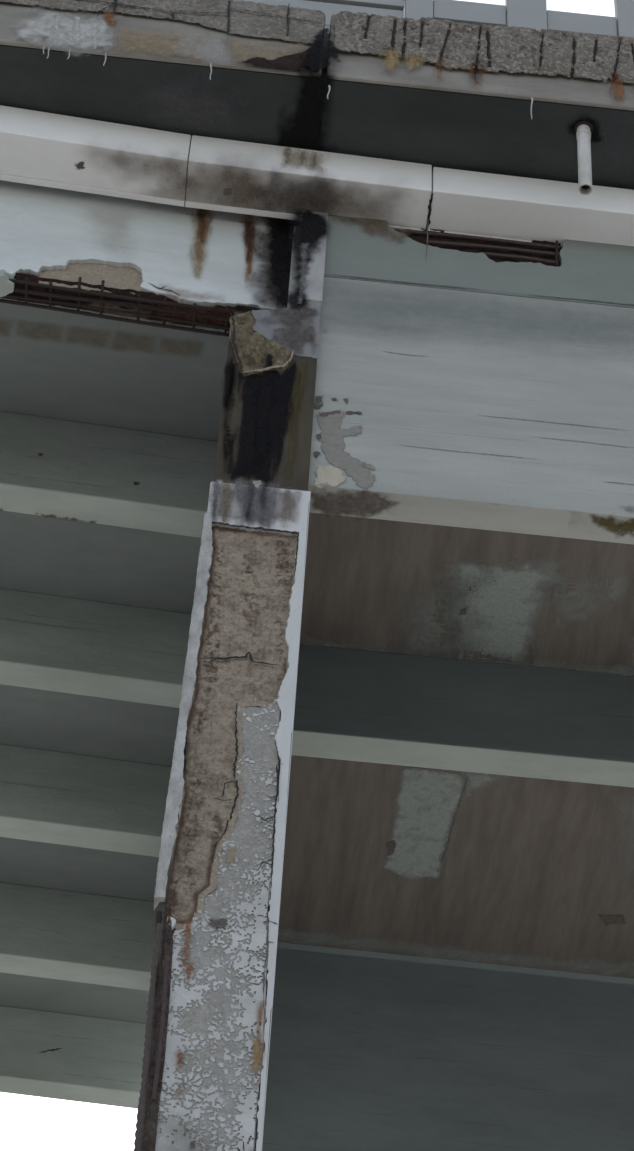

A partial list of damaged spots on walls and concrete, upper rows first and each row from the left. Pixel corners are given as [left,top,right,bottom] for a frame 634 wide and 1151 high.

damp [18,13,205,59]
corrosion [193,209,210,276]
corrosion [242,214,255,280]
damp [176,28,396,528]
spalling [394,225,561,267]
spalling [0,263,295,376]
peeling [314,395,375,488]
peeling [133,522,299,1151]
corrosion [184,920,193,980]
corrosion [253,1007,263,1072]